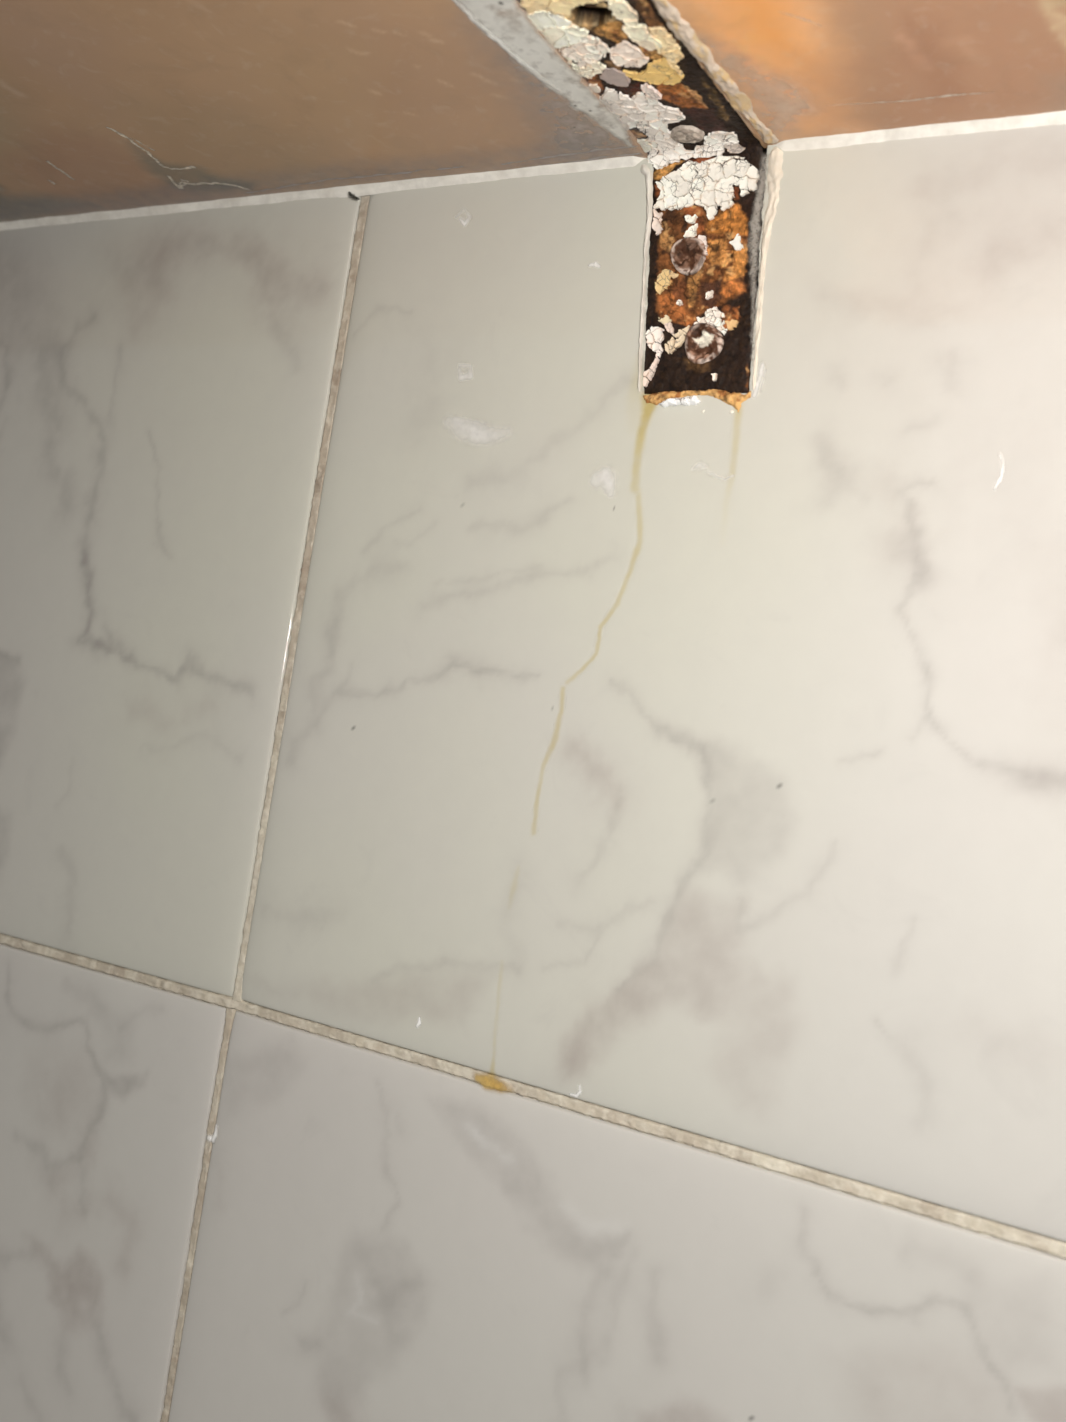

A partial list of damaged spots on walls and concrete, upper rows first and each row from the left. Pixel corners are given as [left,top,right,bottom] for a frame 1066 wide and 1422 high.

peeling [520,0,760,255]
peeling [643,269,739,387]
corrosion [643,389,751,412]
corrosion [475,1075,507,1091]